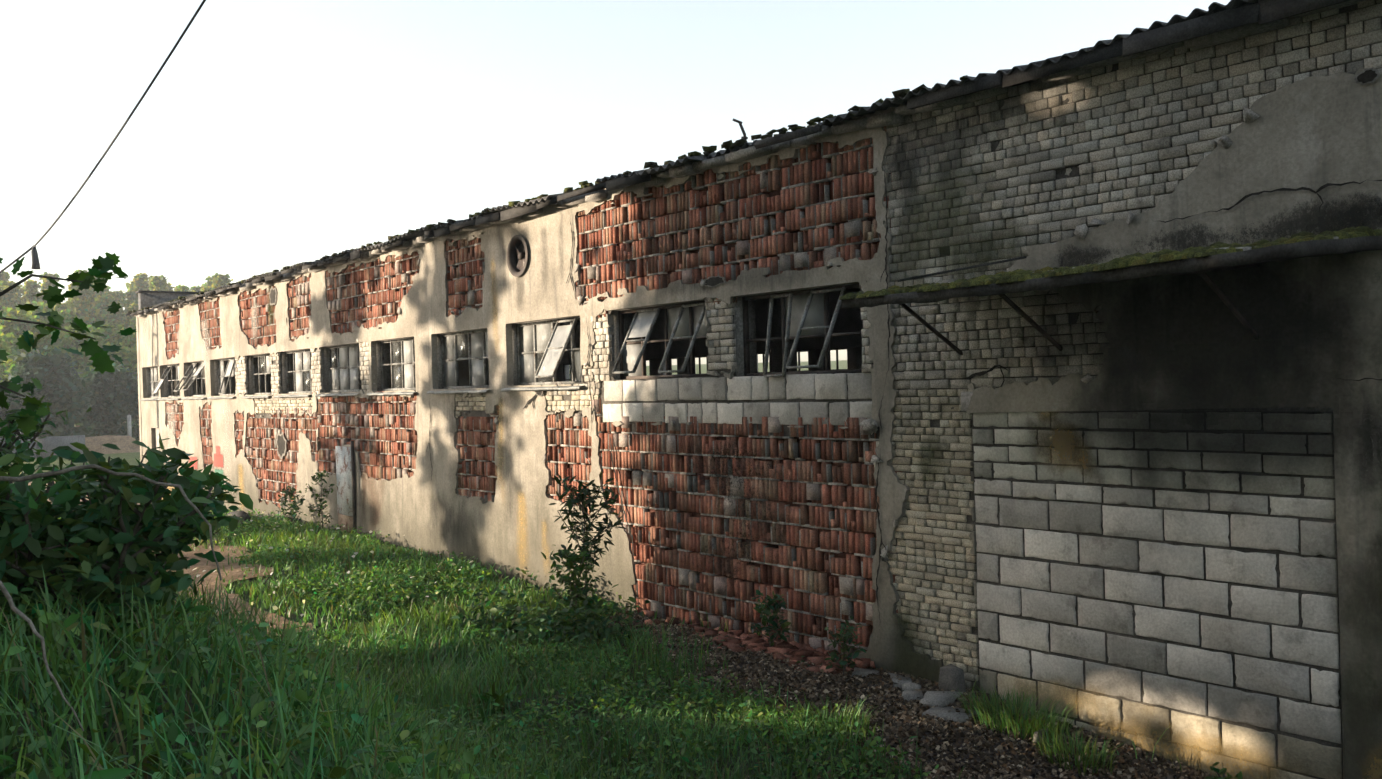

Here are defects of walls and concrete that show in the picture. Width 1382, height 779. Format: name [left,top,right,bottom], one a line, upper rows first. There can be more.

leakage [1059,193,1382,267]
crack [1161,180,1382,223]
flaking render [445,238,485,317]
flaking render [163,309,180,359]
flaking render [199,299,222,350]
flaking render [235,252,420,508]
flaking render [534,0,1382,692]
flaking render [165,400,214,471]
flaking render [455,393,500,504]